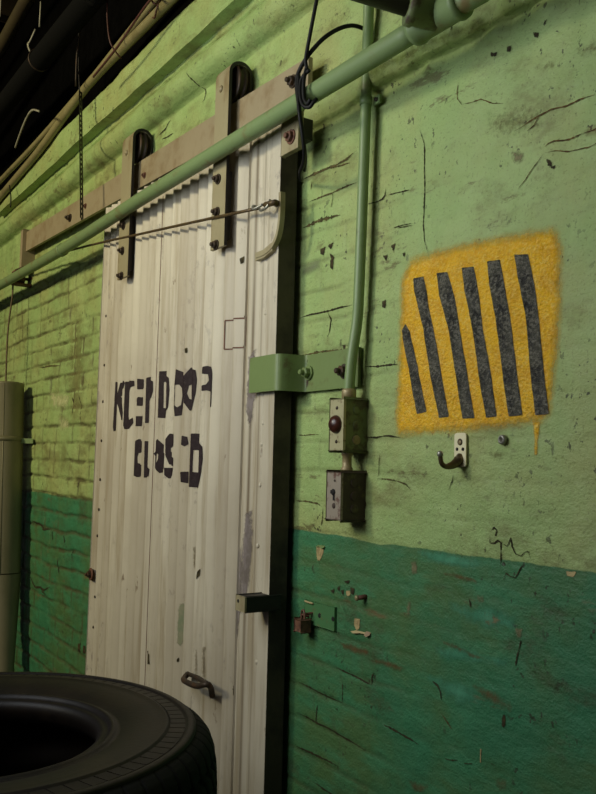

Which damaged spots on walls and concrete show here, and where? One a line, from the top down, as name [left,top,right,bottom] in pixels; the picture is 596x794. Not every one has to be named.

crack [520,95,593,129]
crack [519,128,596,187]
crack [303,150,357,228]
crack [369,132,429,255]
crack [301,306,348,355]
crack [489,527,530,592]
peeling [350,618,371,637]